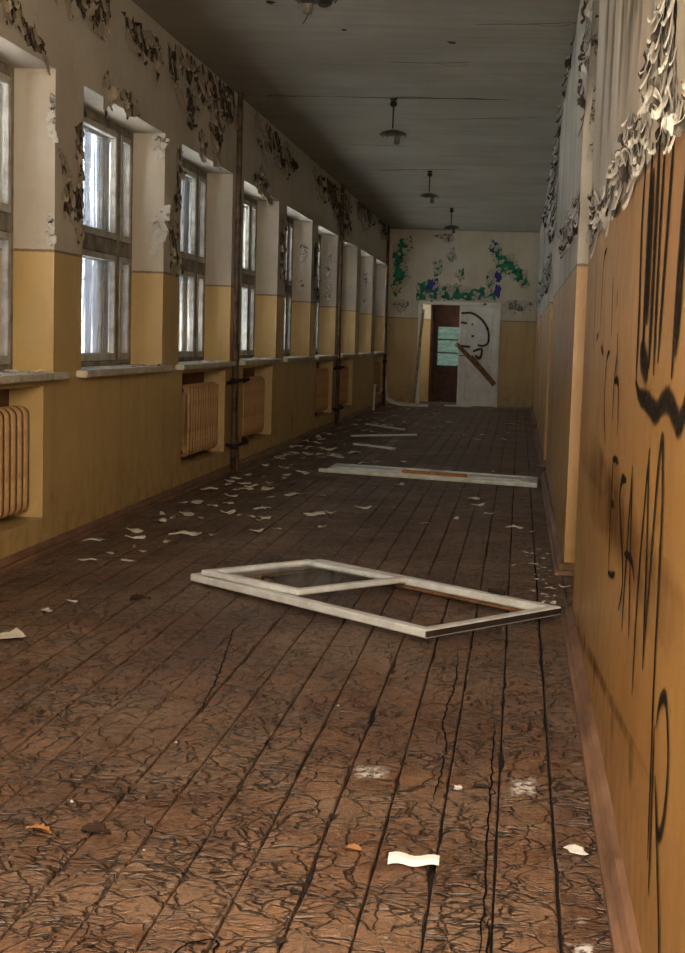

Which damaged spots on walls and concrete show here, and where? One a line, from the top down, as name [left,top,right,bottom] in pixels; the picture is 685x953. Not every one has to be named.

peeling [1,0,51,76]
peeling [54,0,239,170]
peeling [254,114,299,205]
peeling [313,0,685,315]
peeling [279,212,334,302]
crack [431,653,459,806]
crack [470,722,496,953]
crack [157,938,228,953]